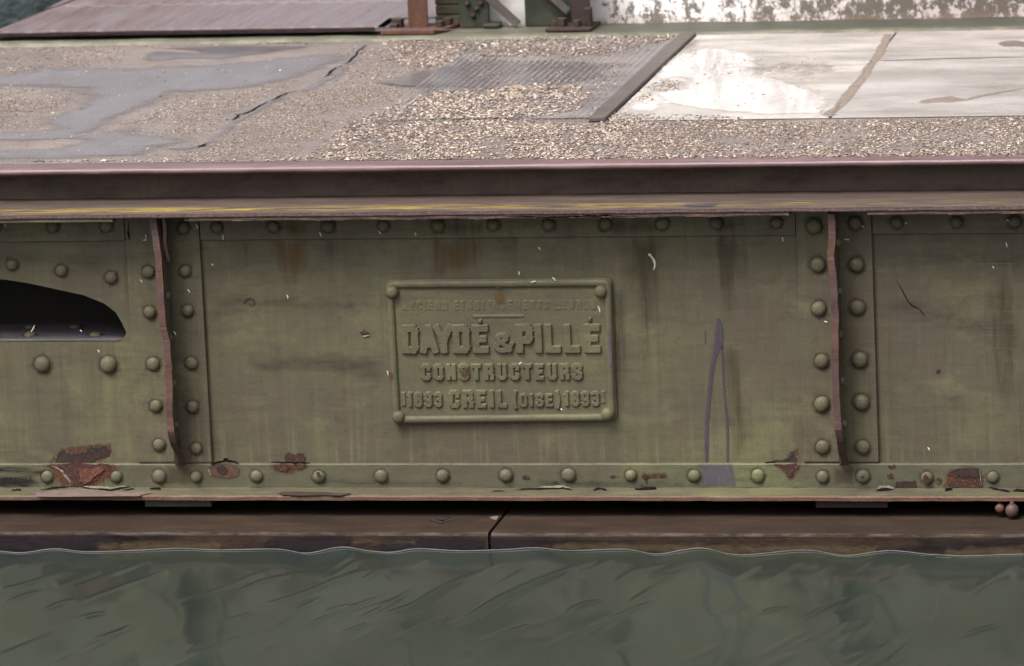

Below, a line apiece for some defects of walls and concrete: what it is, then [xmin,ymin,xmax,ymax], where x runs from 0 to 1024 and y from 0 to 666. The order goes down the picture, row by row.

crack [171,45,366,149]
rust [46,444,116,487]
rust [270,452,320,476]
rust [766,451,800,478]
rust [887,464,983,488]
peeling [32,489,153,497]